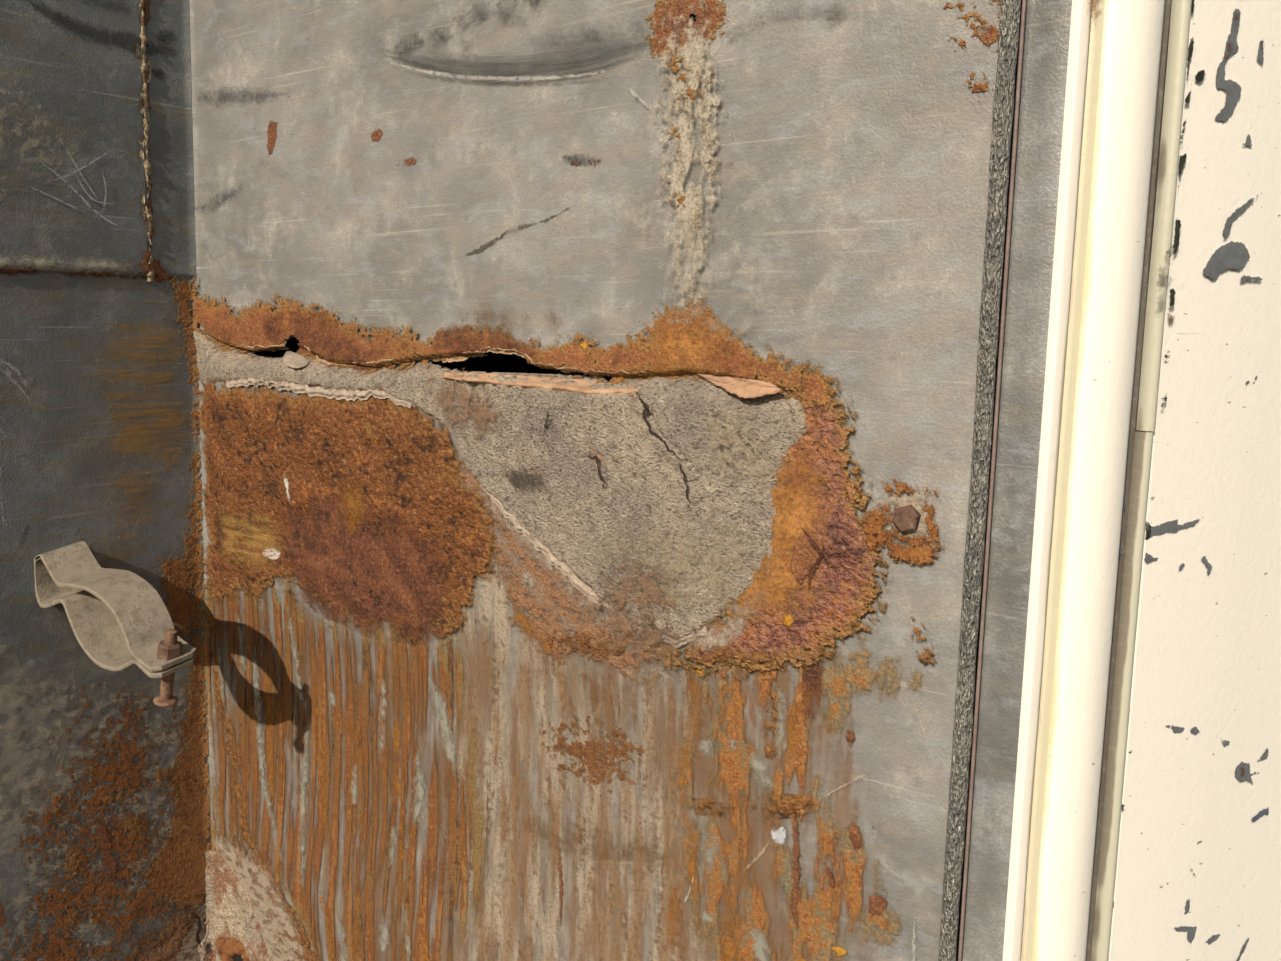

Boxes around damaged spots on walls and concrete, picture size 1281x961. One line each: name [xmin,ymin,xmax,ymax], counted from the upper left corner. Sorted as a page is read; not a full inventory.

corrosion [644,0,726,60]
corrosion [943,0,1001,52]
corrosion [966,72,993,103]
peeling [1185,9,1241,122]
water stain [651,7,729,321]
peeling [1178,121,1187,187]
peeling [1173,218,1181,254]
peeling [1203,193,1263,283]
crack [230,340,691,508]
crack [713,421,757,466]
spalling [193,326,807,657]
corrosion [0,149,945,961]